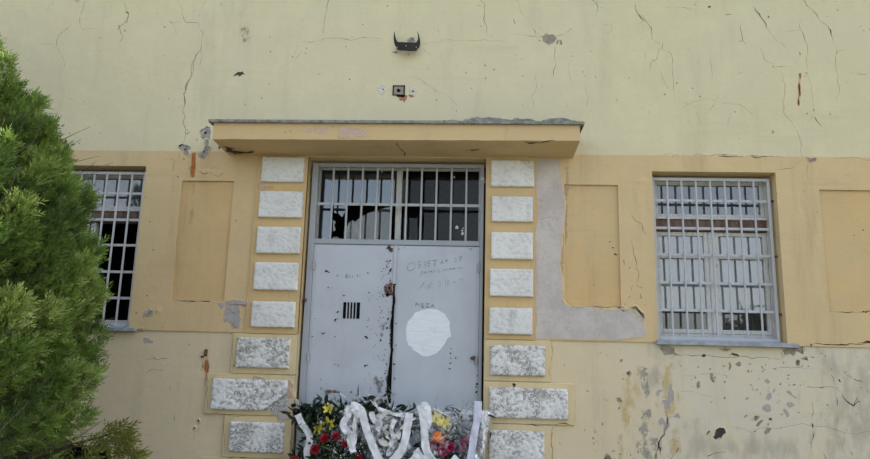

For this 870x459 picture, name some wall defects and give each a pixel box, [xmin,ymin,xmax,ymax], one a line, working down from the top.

crack [172,3,223,187]
spalling [538,33,563,46]
crack [634,2,751,127]
crack [673,0,866,172]
spalling [178,125,212,159]
peeling [660,345,715,389]
peeling [719,345,826,435]
crack [683,355,863,406]
crack [810,339,870,347]
water stain [636,409,658,459]
peeling [641,375,681,457]
spalling [706,426,727,440]